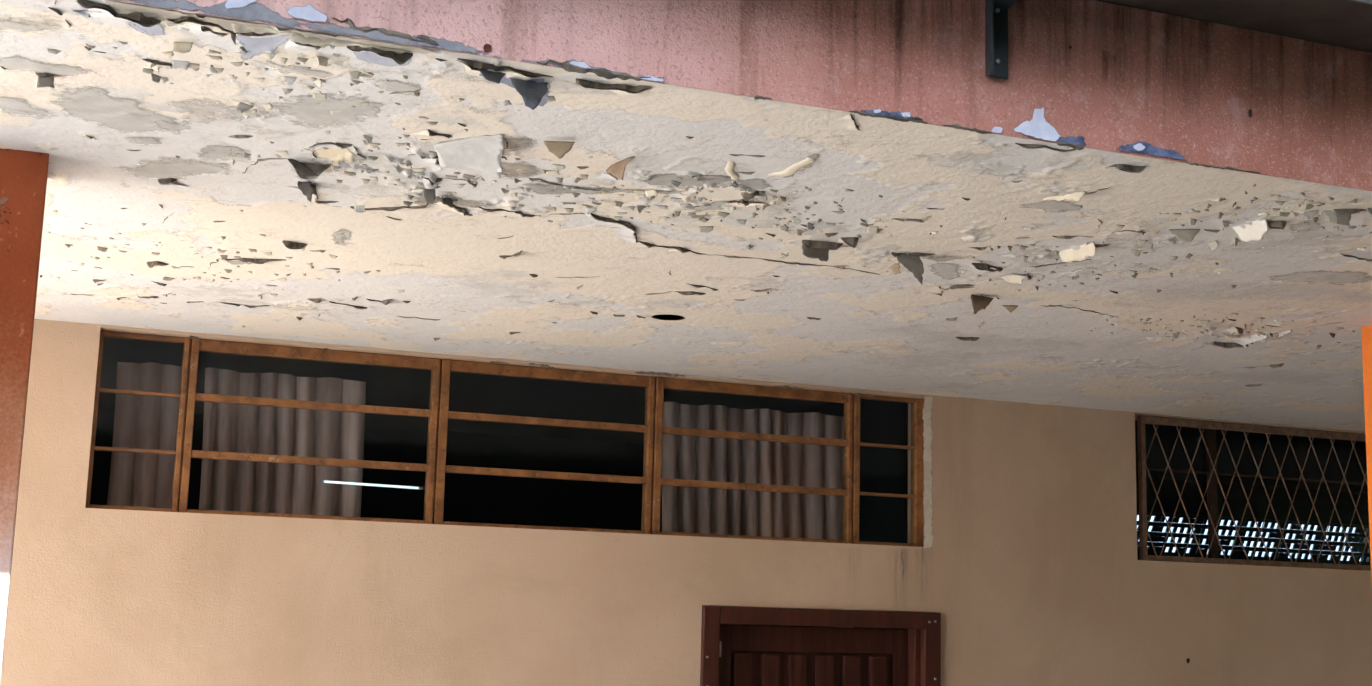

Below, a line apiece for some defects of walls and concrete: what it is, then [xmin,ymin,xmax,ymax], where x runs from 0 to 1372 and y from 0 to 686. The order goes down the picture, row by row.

crack [121,138,240,224]
peeling [0,0,1372,343]
crack [71,196,880,341]